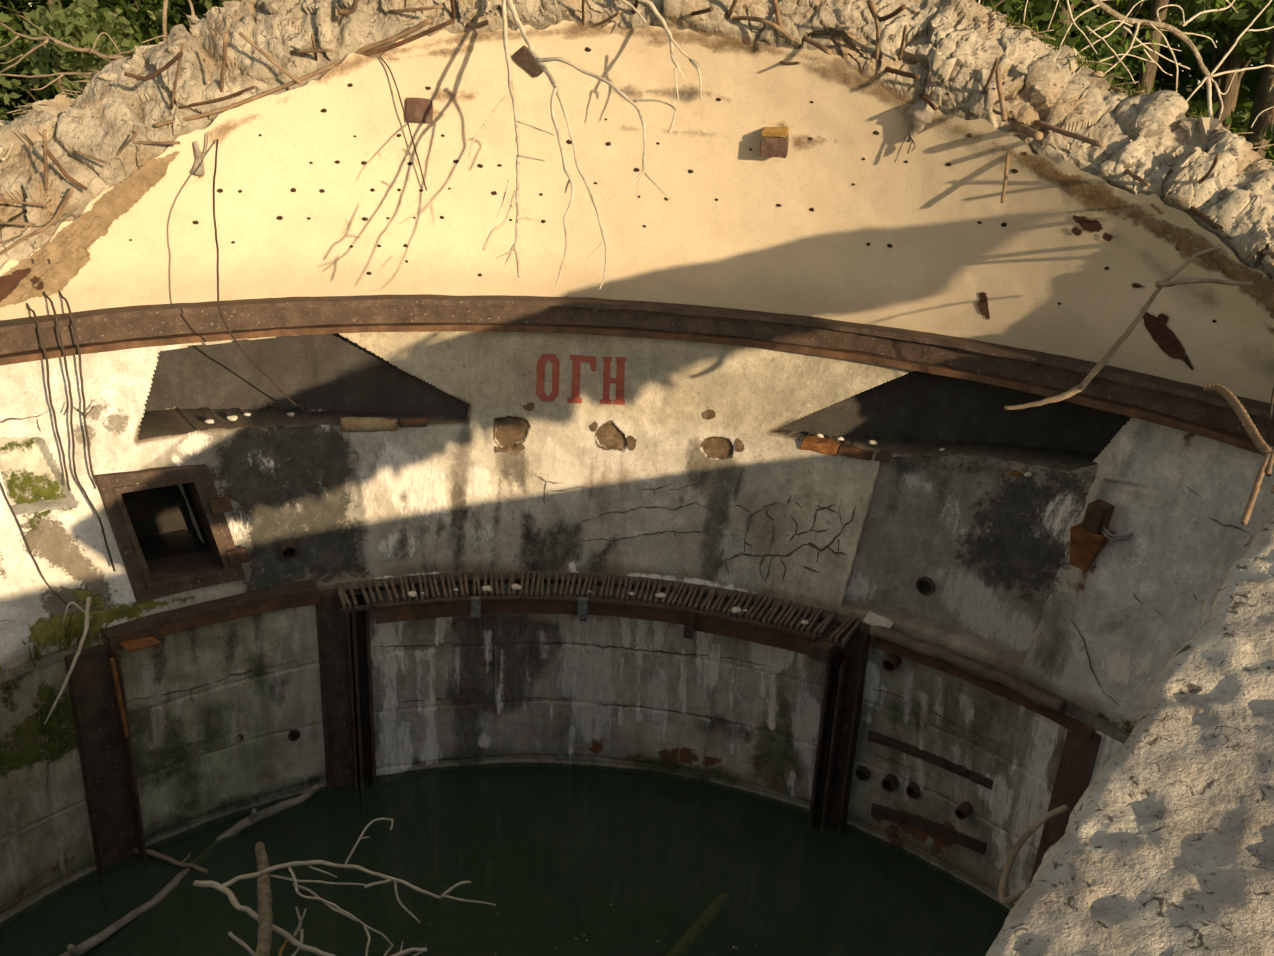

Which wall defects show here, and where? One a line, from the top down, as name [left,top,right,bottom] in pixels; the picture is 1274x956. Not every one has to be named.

spalling [0,0,1274,333]
rust [1071,215,1112,241]
rust [977,292,990,320]
peeling [1143,312,1194,370]
spalling [493,402,535,455]
spalling [590,420,637,451]
water stain [172,425,526,592]
crack [533,474,856,583]
water stain [897,458,1091,665]
water stain [34,681,68,760]
water stain [370,614,821,797]
rust [658,747,721,767]